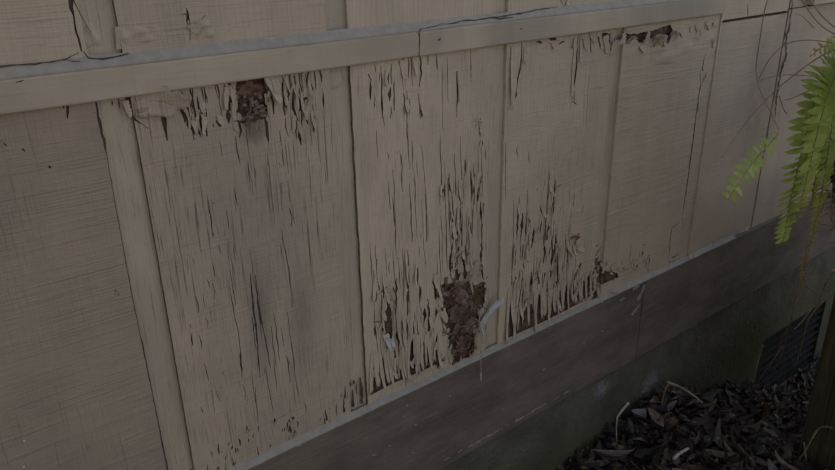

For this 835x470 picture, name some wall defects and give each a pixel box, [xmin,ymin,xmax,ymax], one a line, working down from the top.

crack [0,0,129,68]
peeling [128,86,190,139]
crack [183,83,268,173]
spalling [231,76,283,141]
crack [280,70,324,144]
crack [369,6,558,118]
spalling [537,25,680,57]
crack [95,97,168,470]
crack [190,256,294,376]
crack [324,159,485,423]
spalling [369,198,649,394]
crack [207,426,270,470]